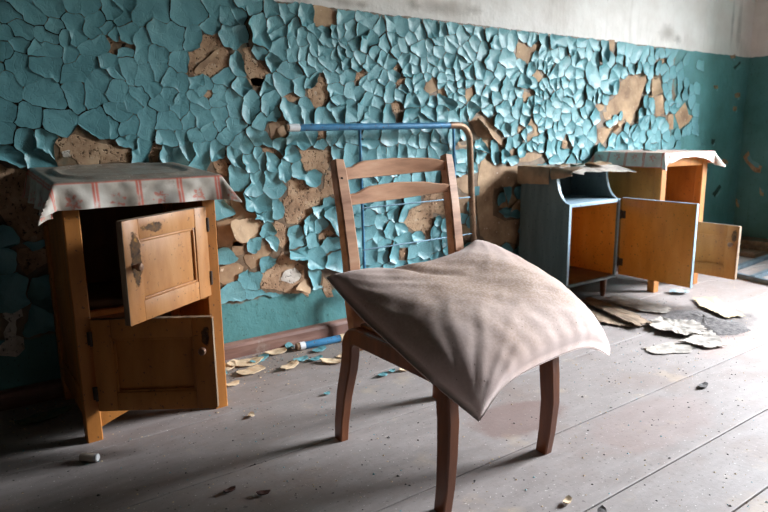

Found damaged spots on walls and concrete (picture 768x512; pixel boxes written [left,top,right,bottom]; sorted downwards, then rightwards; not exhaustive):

crack [0,0,520,273]
peeling [0,0,585,304]
peeling [587,40,700,155]